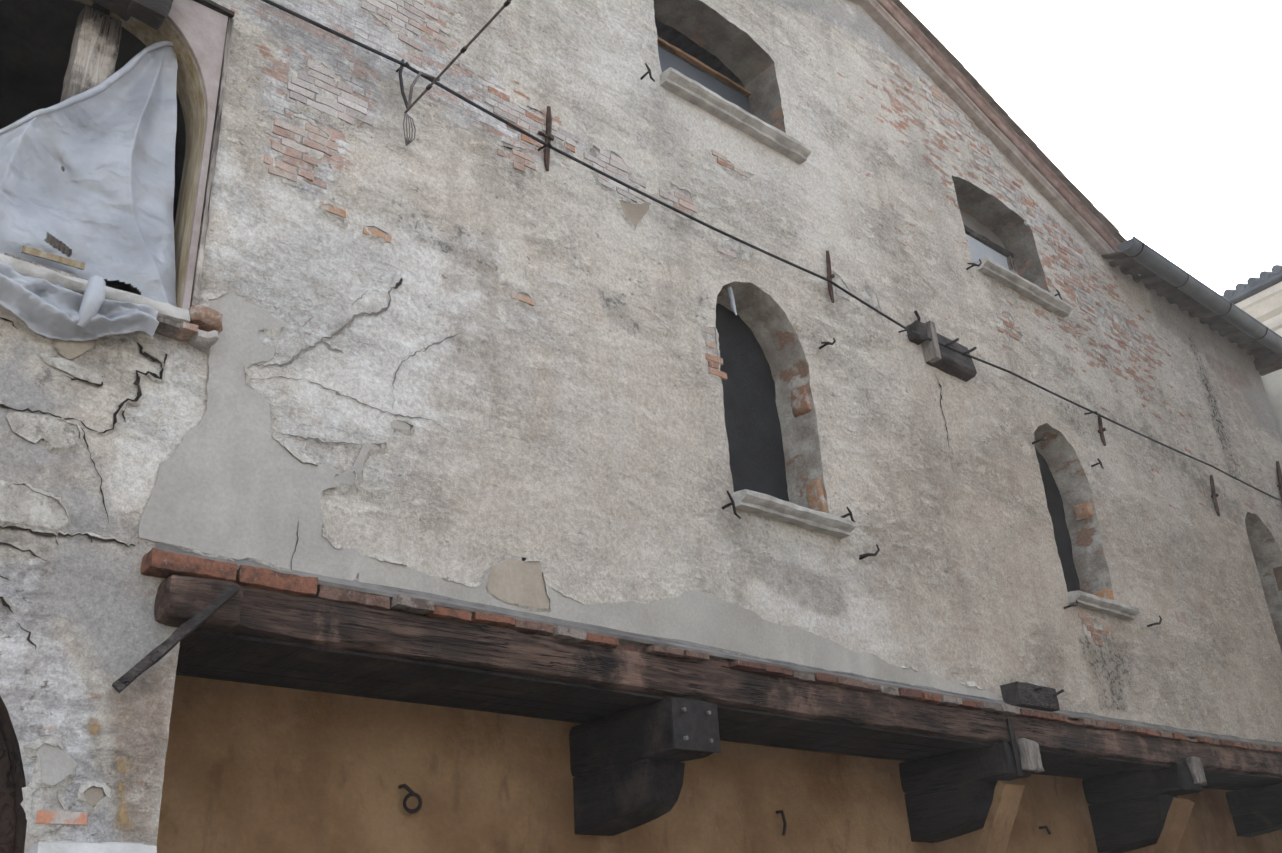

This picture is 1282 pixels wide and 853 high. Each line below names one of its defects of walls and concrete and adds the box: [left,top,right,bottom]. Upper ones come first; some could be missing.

flaking render [264,60,372,186]
flaking render [312,199,391,244]
flaking render [484,86,697,230]
flaking render [919,76,1093,291]
crack [249,278,466,433]
flaking render [994,307,1023,343]
crack [0,341,169,649]
spalling [139,288,999,700]